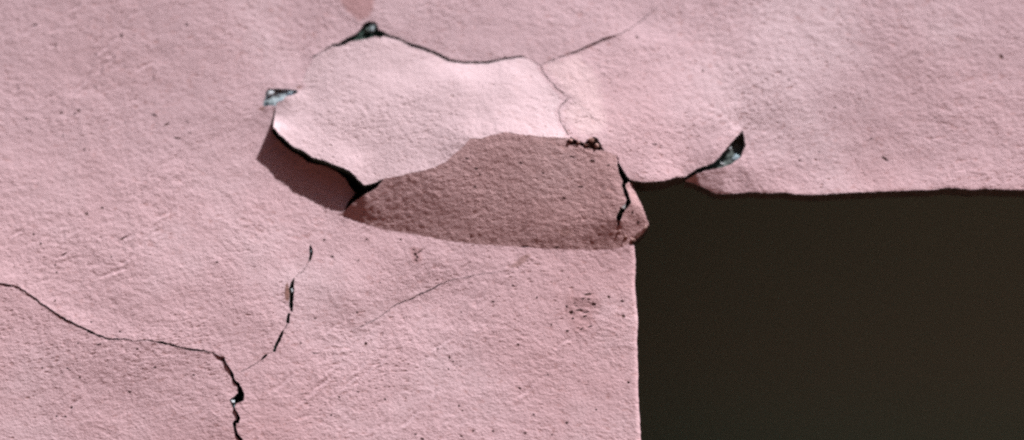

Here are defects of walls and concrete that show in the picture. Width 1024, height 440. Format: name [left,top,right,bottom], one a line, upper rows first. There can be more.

spalling [263,88,298,106]
crack [311,7,658,135]
spalling [567,137,610,166]
spalling [684,130,746,183]
crack [0,244,313,440]